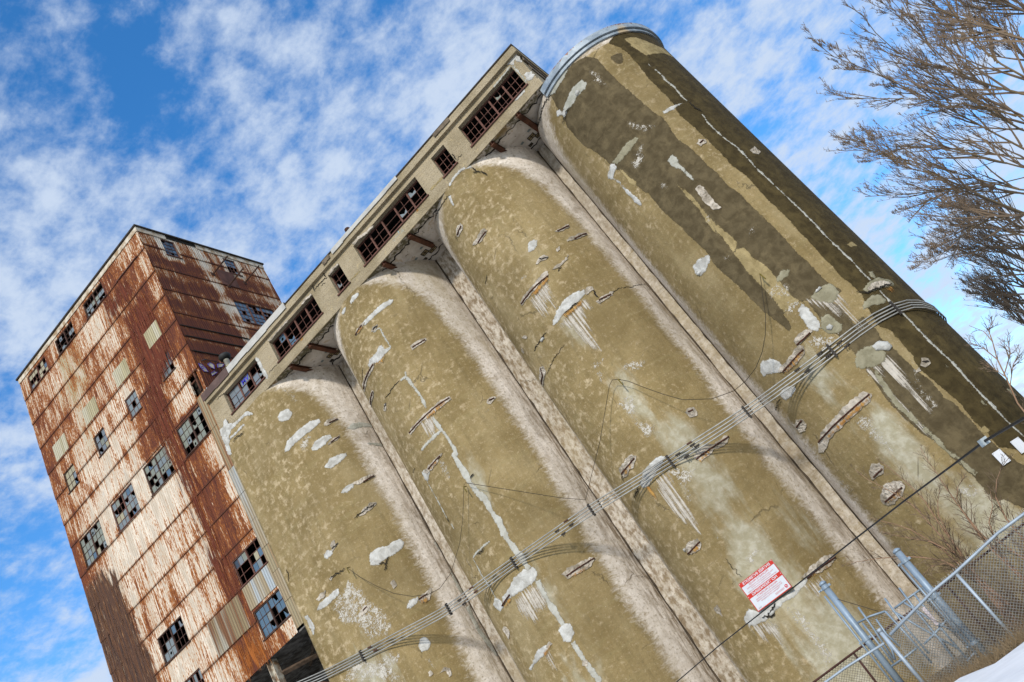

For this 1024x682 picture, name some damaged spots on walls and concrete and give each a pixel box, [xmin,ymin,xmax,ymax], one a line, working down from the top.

leakage [531,284,555,315]
spalling [520,224,587,305]
leakage [551,32,1024,508]
spalling [778,324,839,373]
rust [103,274,241,599]
spalling [668,435,729,498]
spalling [818,391,892,453]
spalling [869,463,905,506]
spalling [561,557,595,579]
rust [87,569,160,682]
rust [237,624,269,679]
leakage [516,586,547,621]